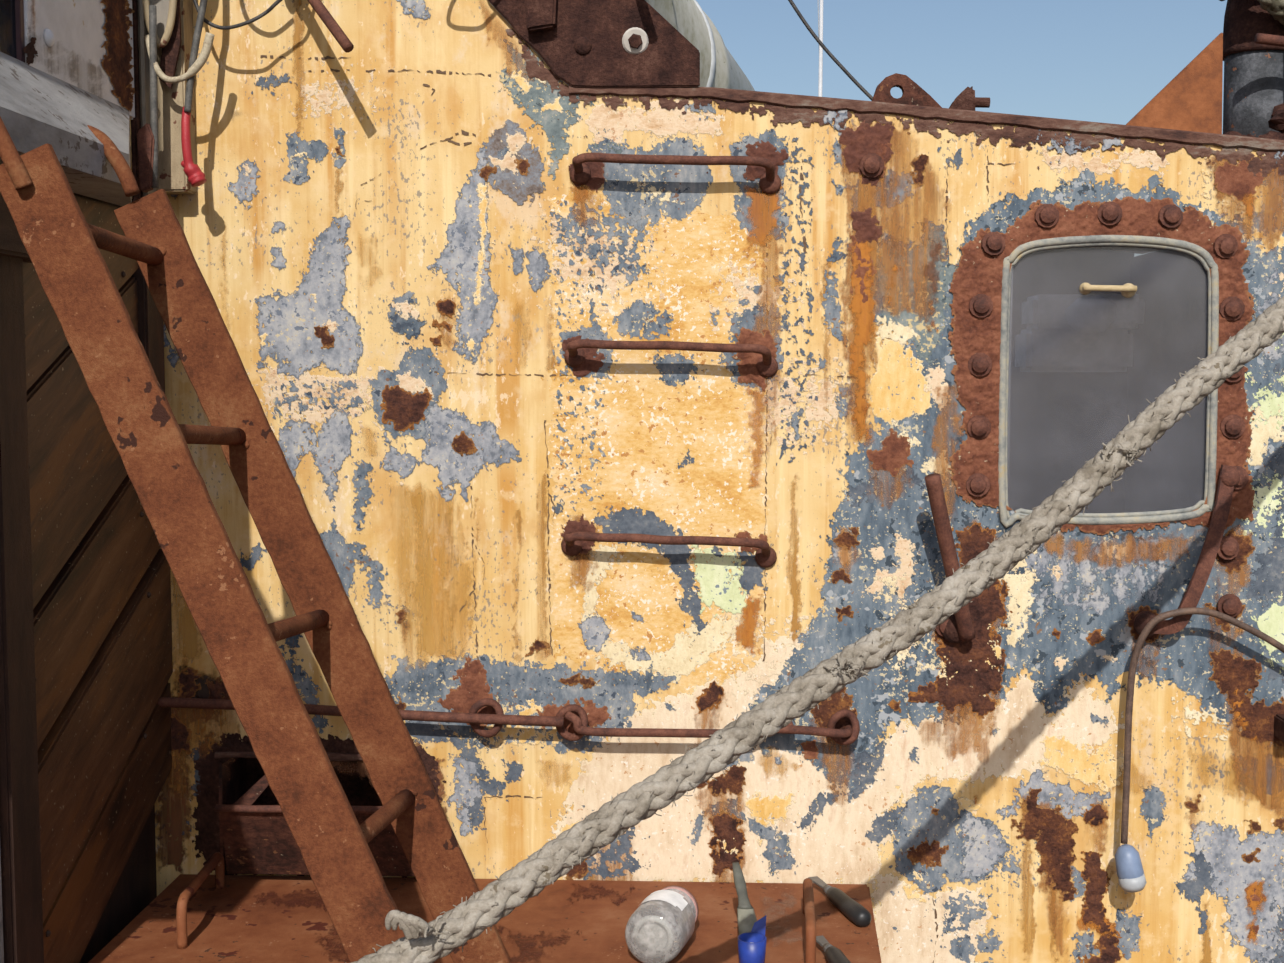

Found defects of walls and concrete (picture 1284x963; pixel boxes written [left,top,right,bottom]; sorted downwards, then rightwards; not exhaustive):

rust [100,0,137,112]
rust [479,6,1284,499]
peeling [250,39,1284,714]
rust [932,387,996,568]
peeling [384,612,679,836]
rust [696,680,724,729]
rust [697,765,763,882]
rust [763,687,861,801]
rust [904,579,1015,761]
peeling [687,333,1284,963]
rust [1011,787,1125,963]
rust [1204,603,1284,816]